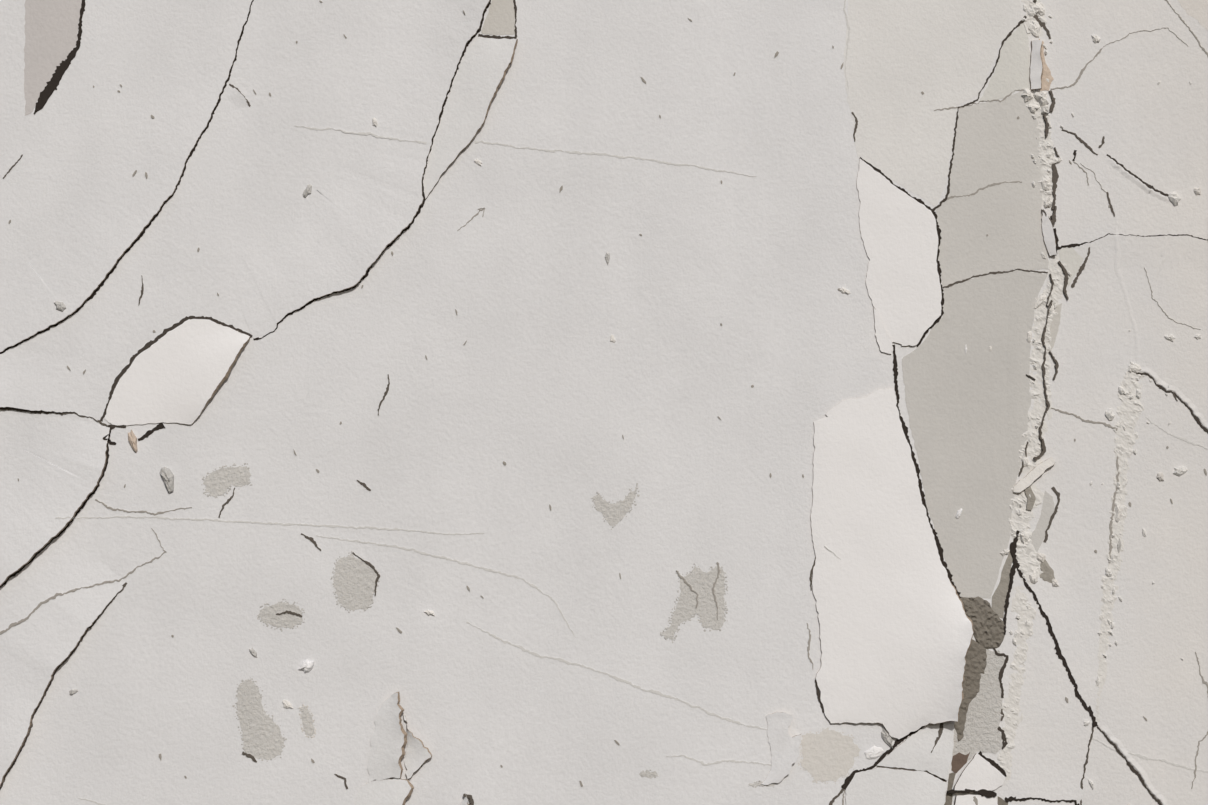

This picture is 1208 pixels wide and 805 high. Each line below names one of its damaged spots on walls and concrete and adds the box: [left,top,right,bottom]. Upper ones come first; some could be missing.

flaking render [24,0,82,115]
peeling [423,0,518,199]
crack [0,0,517,790]
peeling [802,0,1084,805]
crack [852,0,1208,612]
crack [676,562,720,620]
crack [808,558,816,591]
crack [807,623,824,713]
crack [829,487,1208,805]
crack [463,794,474,805]